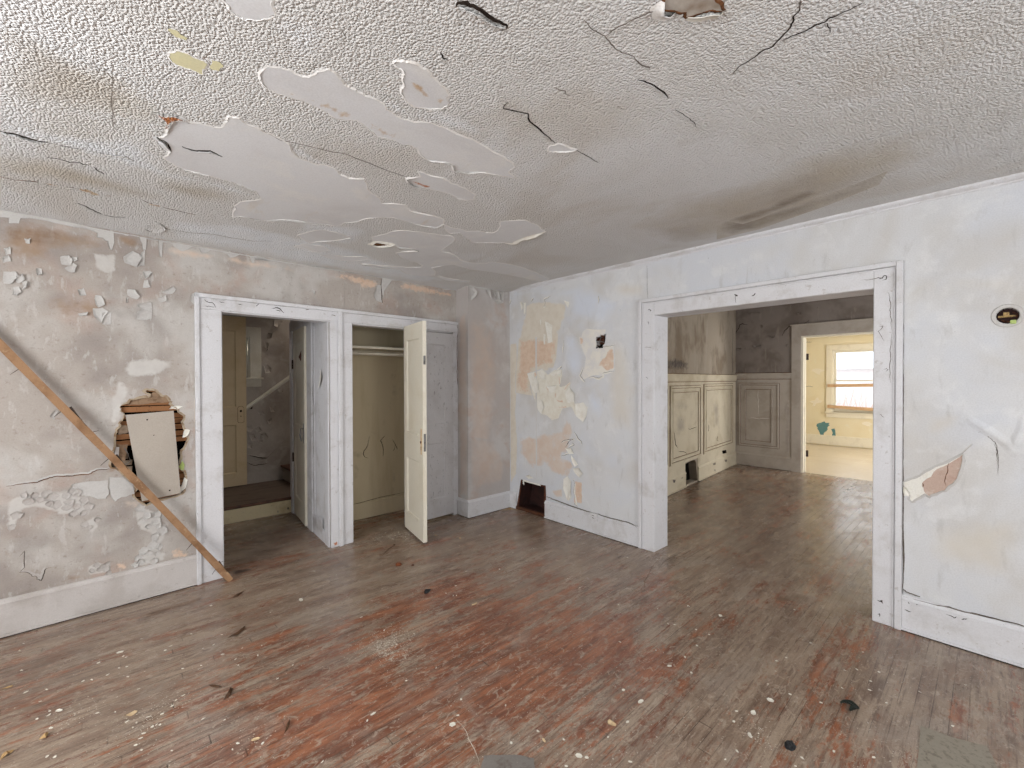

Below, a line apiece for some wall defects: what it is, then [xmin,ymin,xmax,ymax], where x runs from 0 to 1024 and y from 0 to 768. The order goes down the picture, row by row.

crack [456,0,508,31]
crack [583,11,696,127]
crack [734,0,862,74]
peeling [153,113,546,245]
peeling [257,59,517,201]
crack [501,101,598,163]
peeling [527,328,615,423]
peeling [5,388,190,569]
peeling [903,444,974,503]